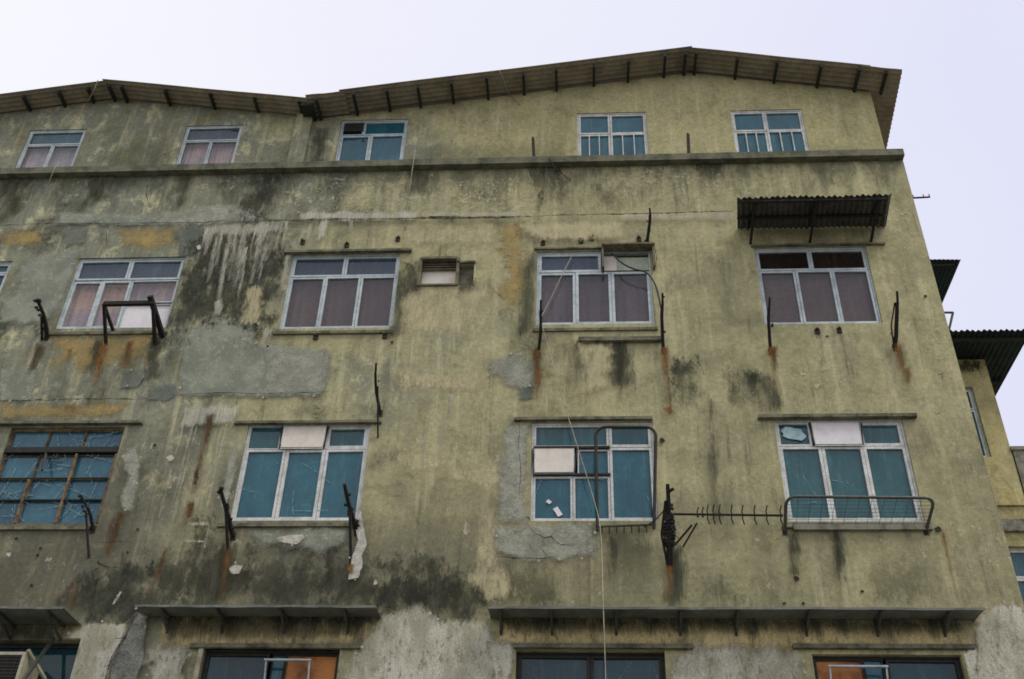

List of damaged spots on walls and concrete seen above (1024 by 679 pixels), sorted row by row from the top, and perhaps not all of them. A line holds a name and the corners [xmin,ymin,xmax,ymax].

water stain [34,172,291,380]
corrosion [533,346,542,383]
water stain [576,341,633,391]
water stain [745,371,781,410]
corrosion [895,344,911,383]
spalling [121,449,142,511]
corrosion [193,414,213,485]
spalling [348,511,367,581]
crack [497,524,574,559]
water stain [56,513,509,648]
peeling [58,607,192,679]